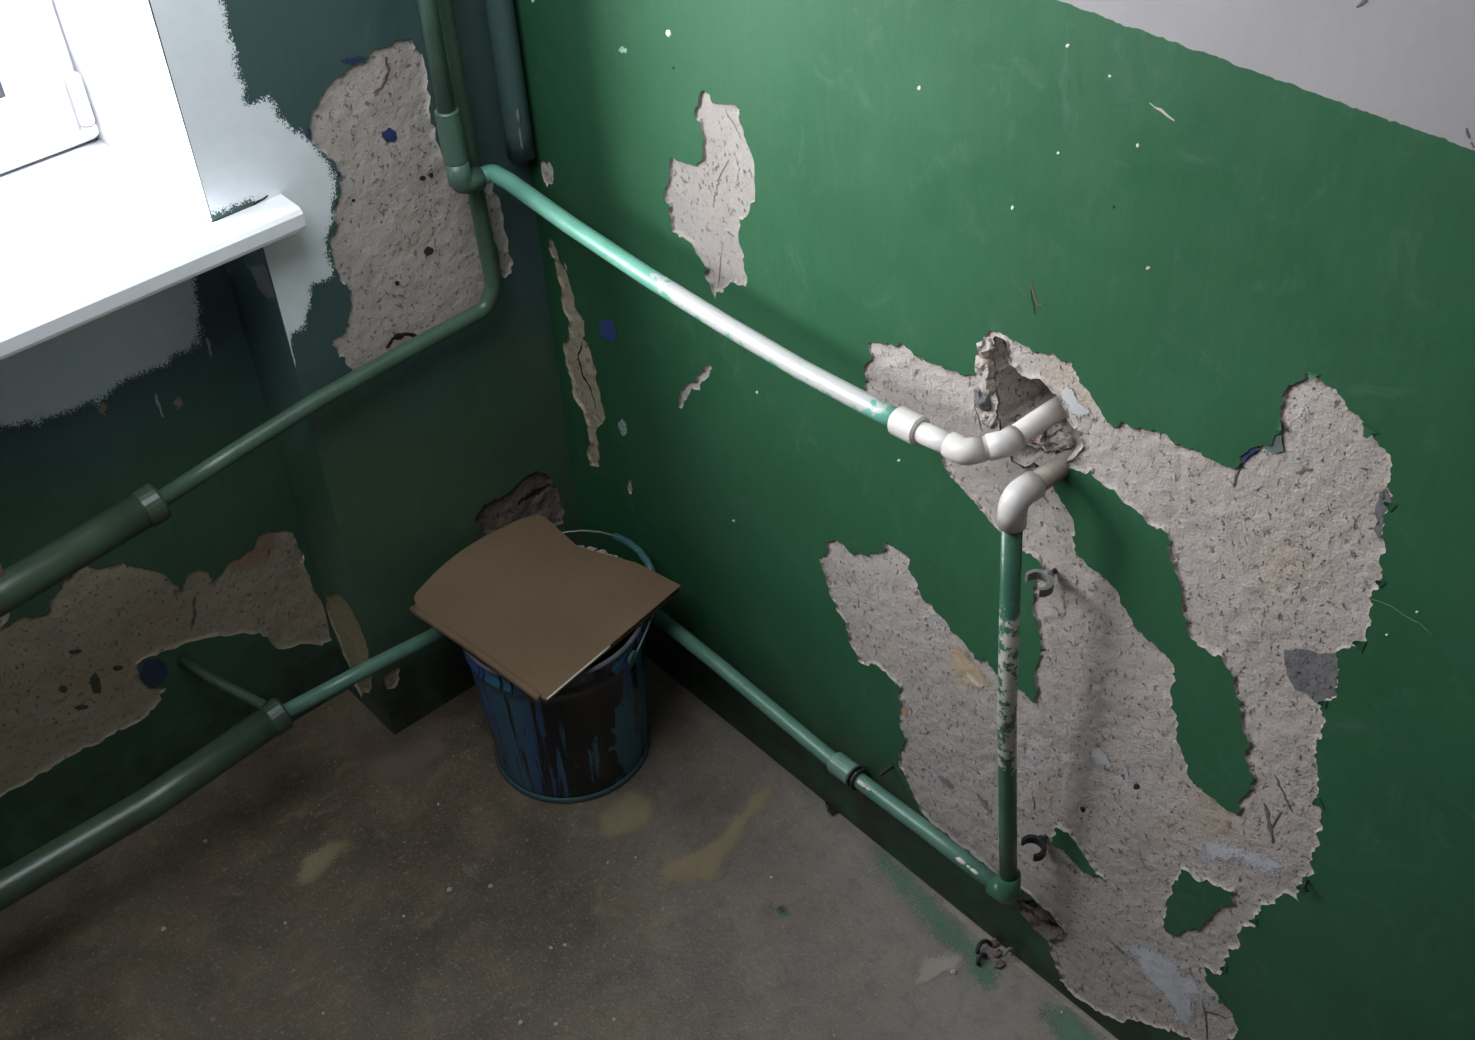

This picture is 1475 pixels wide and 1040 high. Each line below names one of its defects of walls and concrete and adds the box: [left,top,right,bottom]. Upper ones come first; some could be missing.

peeling [307,39,513,371]
peeling [549,239,605,467]
peeling [664,91,755,300]
peeling [0,529,400,797]
peeling [819,540,999,875]
peeling [863,330,1396,1040]